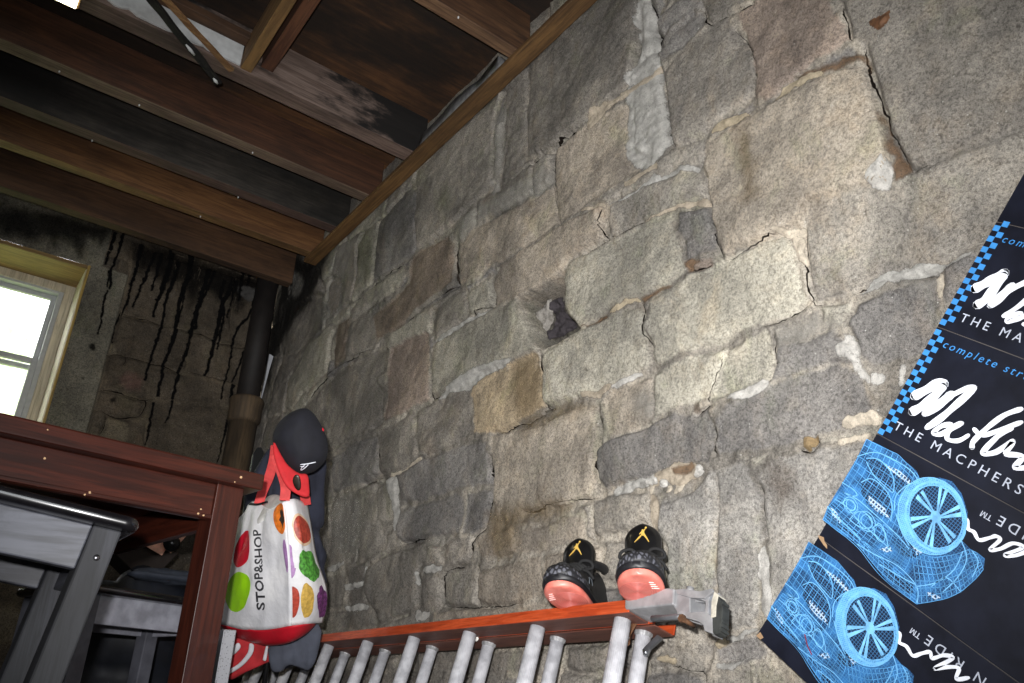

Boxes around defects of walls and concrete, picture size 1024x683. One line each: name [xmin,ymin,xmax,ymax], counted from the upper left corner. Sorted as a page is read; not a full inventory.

crack [843,9,934,172]
damp [0,208,257,445]
spalling [536,297,578,340]